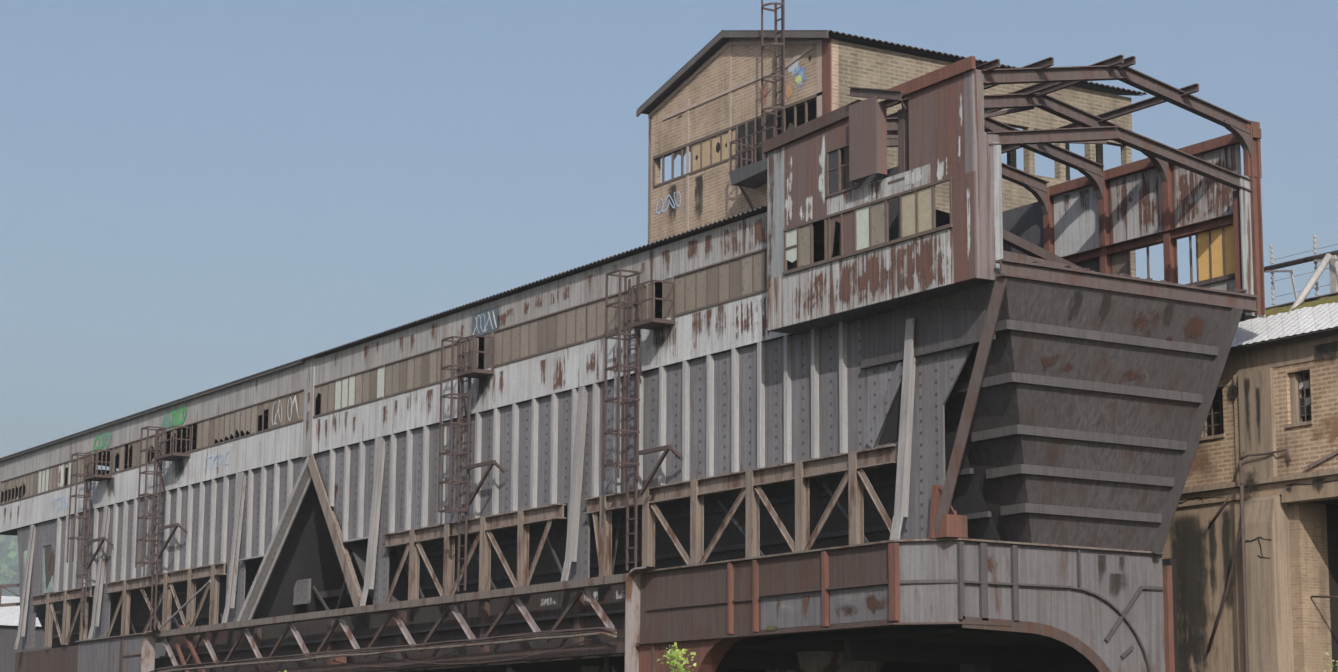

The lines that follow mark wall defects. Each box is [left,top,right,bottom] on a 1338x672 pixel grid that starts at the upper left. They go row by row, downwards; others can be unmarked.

rust [667,306,726,354]
rust [306,392,356,439]